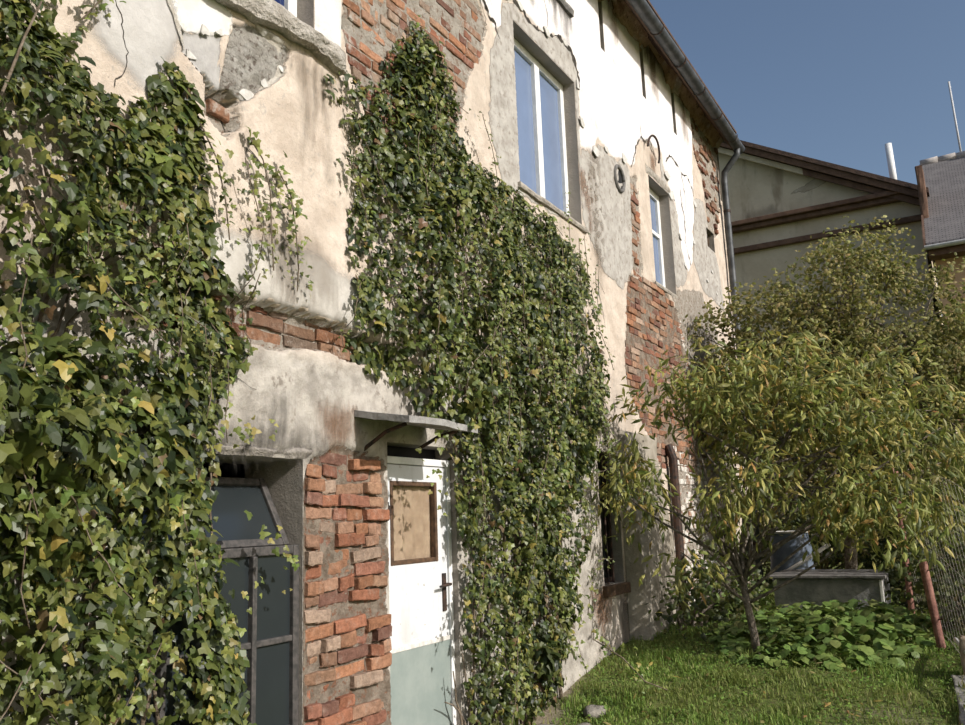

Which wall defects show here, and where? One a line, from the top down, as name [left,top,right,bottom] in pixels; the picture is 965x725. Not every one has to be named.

crack [101,0,129,86]
flaking render [167,0,289,140]
crack [480,0,500,39]
crack [513,0,580,90]
flaking render [149,282,399,375]
flaking render [341,0,727,606]